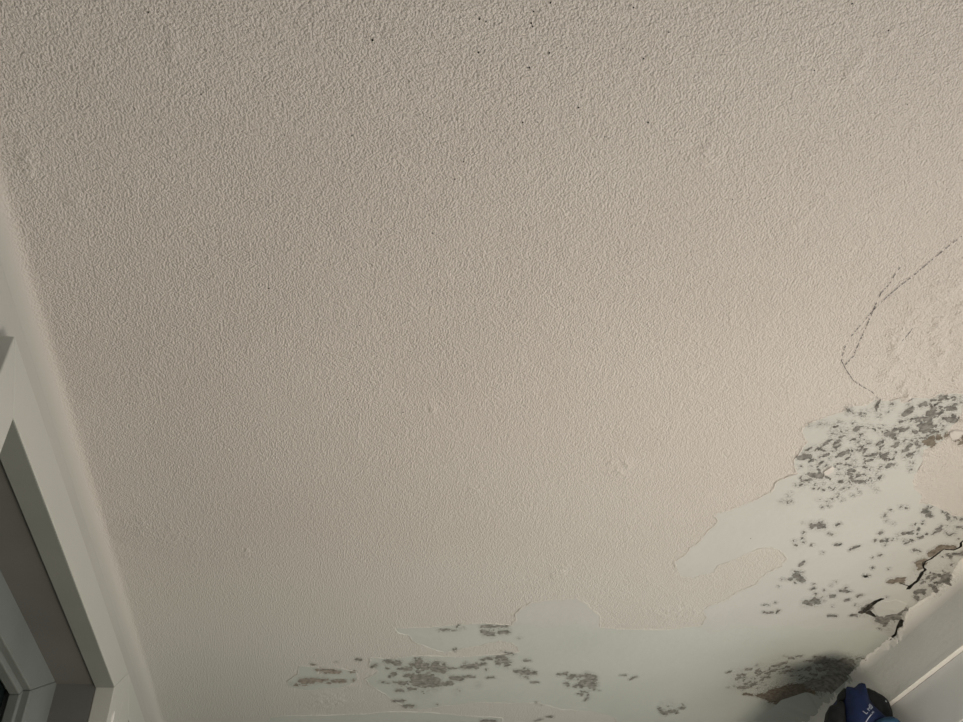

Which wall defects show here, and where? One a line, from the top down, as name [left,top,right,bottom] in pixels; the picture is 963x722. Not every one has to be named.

peeling [293,390,963,722]
crack [852,540,963,641]